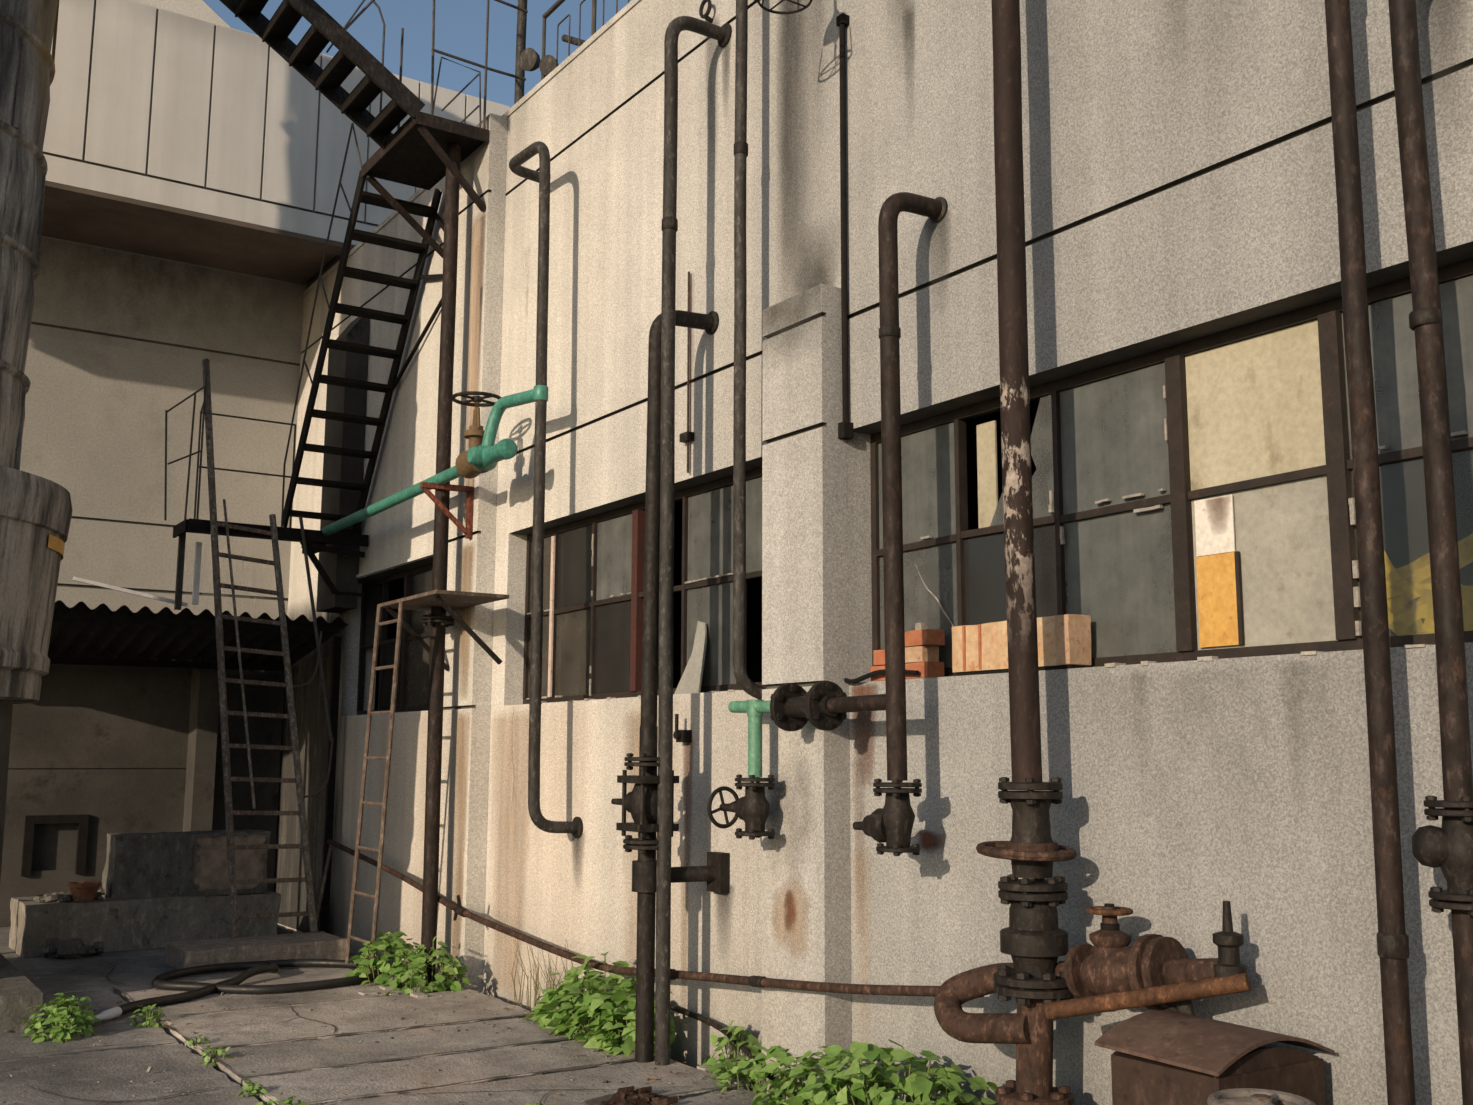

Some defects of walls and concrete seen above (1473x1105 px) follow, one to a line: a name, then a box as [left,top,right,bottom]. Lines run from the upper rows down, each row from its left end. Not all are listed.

leakage [784,0,801,184]
corrosion [920,831,939,849]
corrosion [776,893,802,940]